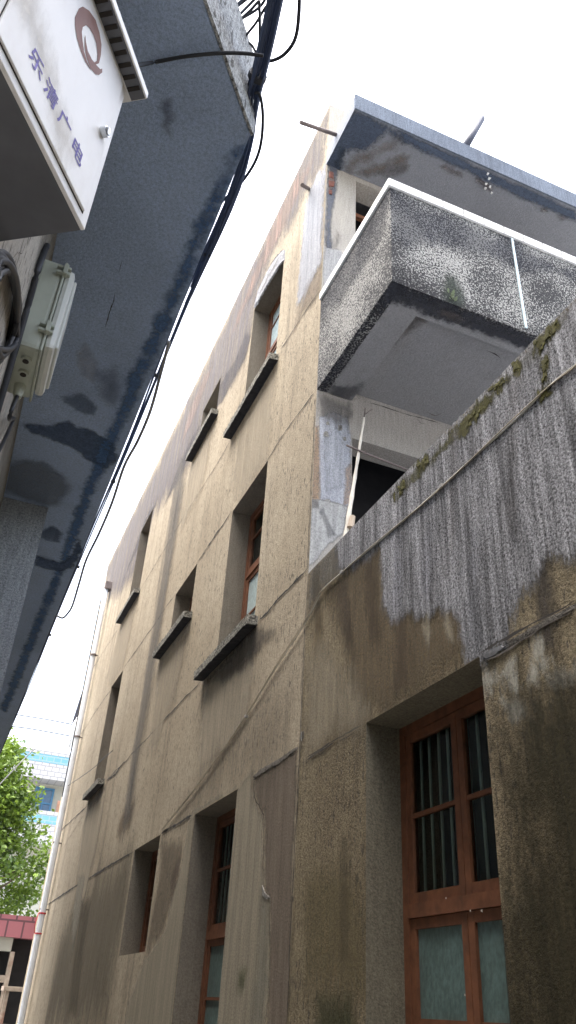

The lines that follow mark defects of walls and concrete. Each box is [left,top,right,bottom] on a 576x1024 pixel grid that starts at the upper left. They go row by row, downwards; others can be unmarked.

damp [0,179,229,712]
damp [106,111,576,832]
damp [310,281,576,1024]